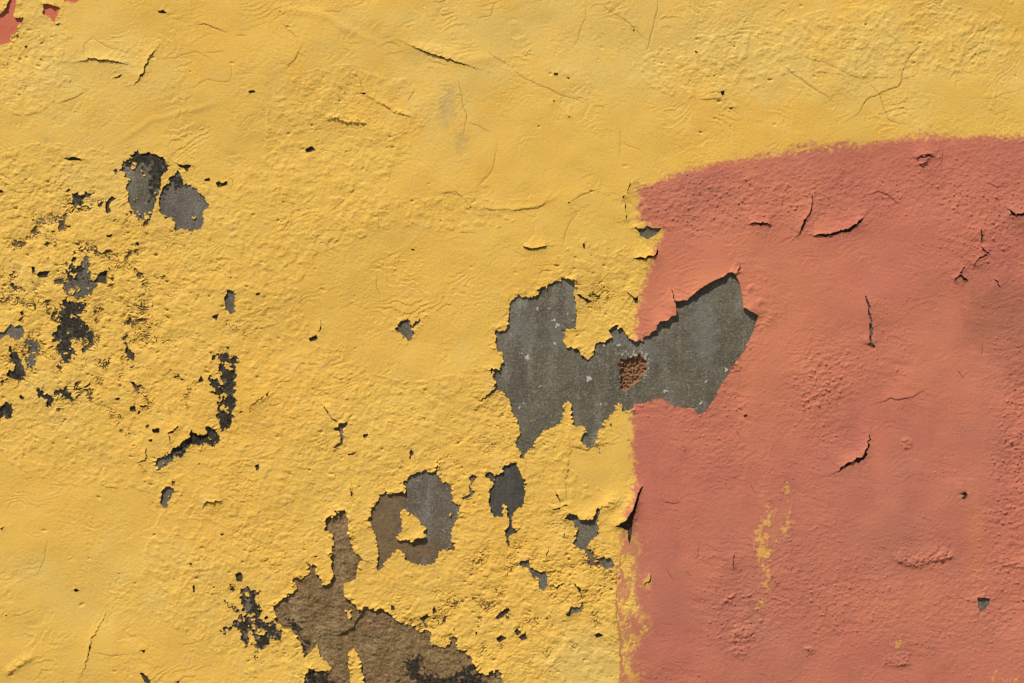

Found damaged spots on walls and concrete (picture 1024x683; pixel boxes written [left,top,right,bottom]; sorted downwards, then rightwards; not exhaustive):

crack [750,191,897,244]
peeling [0,143,227,435]
crack [865,296,873,343]
peeling [264,263,765,683]
crack [835,435,871,473]